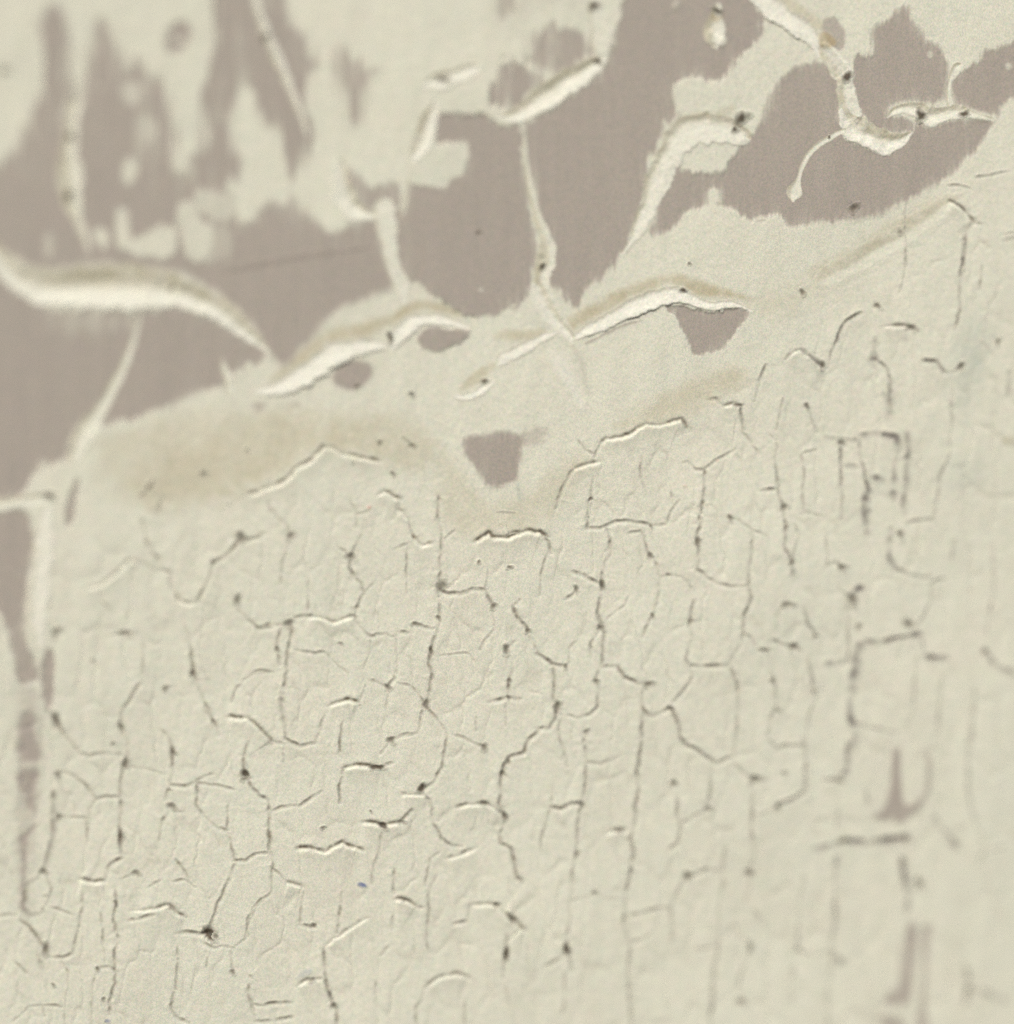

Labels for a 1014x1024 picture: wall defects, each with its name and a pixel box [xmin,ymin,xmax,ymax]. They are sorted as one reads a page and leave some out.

peeling [346,0,1014,367]
peeling [0,0,472,922]
peeling [452,377,498,402]
crack [0,202,1006,1024]
peeling [459,423,555,492]
crack [978,537,1014,678]